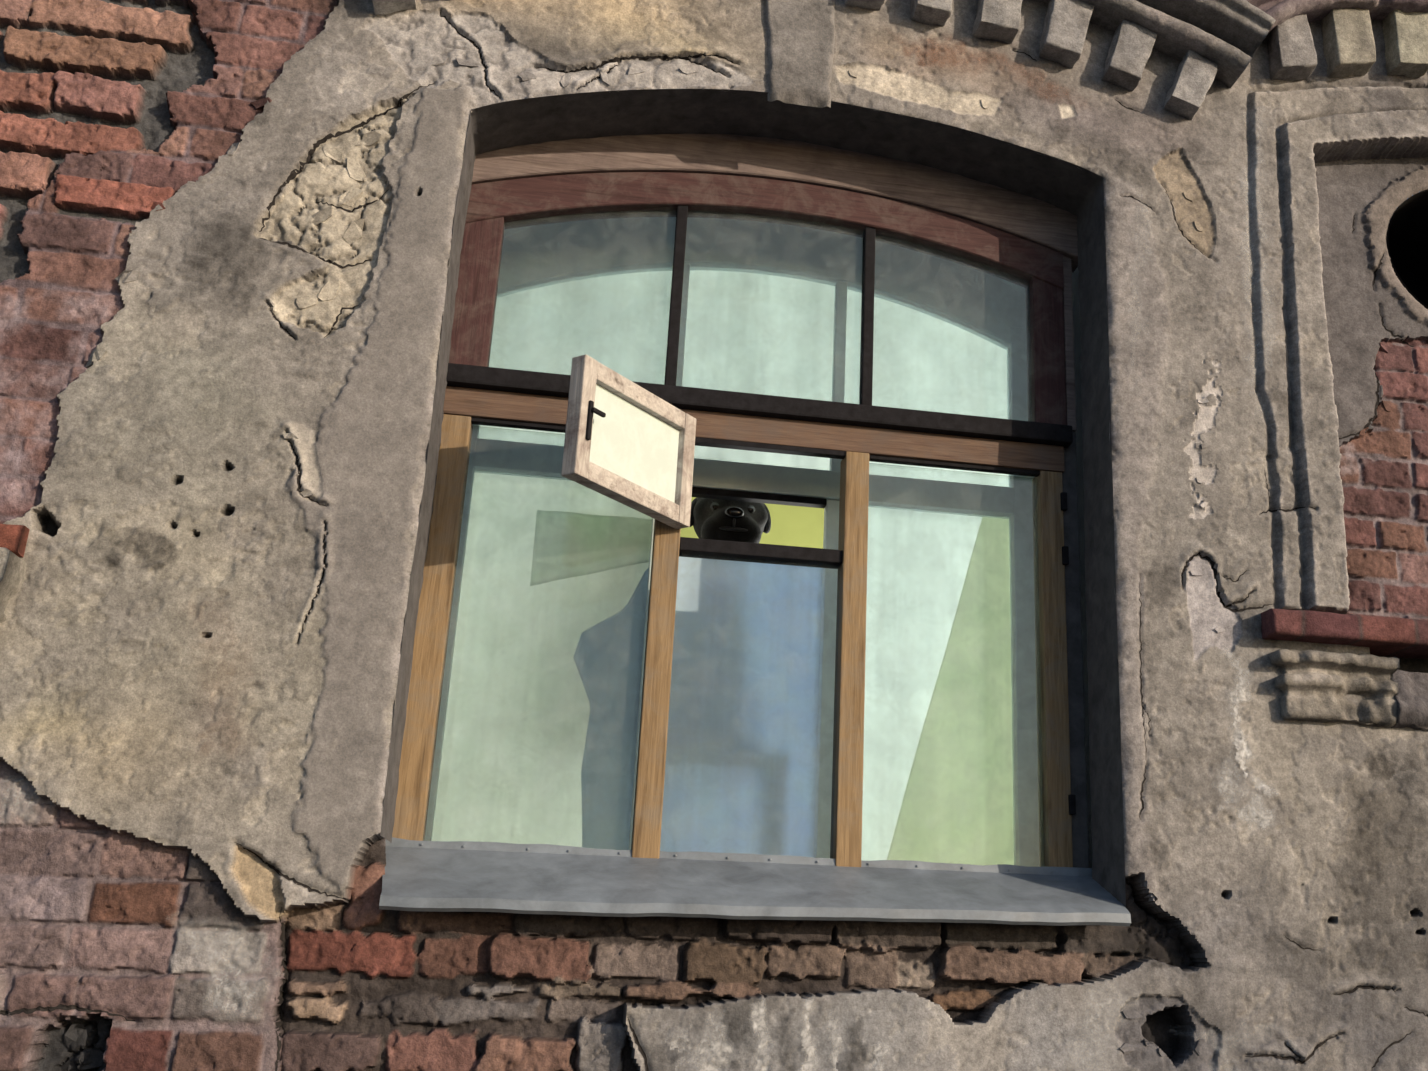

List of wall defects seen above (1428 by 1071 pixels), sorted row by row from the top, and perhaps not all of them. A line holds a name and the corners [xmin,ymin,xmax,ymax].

crack [440,12,500,98]
crack [535,53,740,90]
flaking render [0,0,339,537]
flaking render [1153,147,1217,259]
crack [286,432,326,643]
flaking render [1339,336,1428,620]
crack [1139,578,1151,817]
flaking render [0,757,1223,1071]
crack [1245,1034,1342,1064]
crack [1334,985,1426,1068]